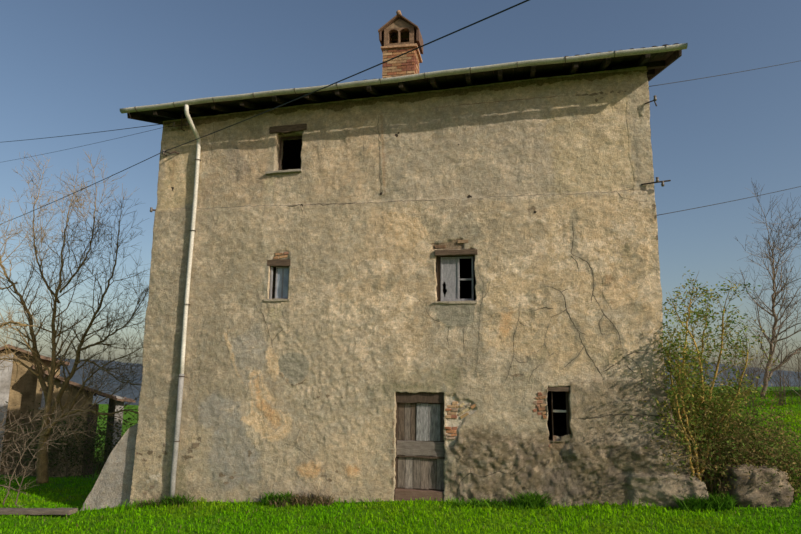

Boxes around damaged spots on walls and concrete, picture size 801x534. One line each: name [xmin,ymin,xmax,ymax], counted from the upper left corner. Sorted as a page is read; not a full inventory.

crack [171,116,441,269]
crack [407,265,489,377]
crack [468,189,649,392]
peeling [222,331,294,457]
spalling [444,393,477,448]
spalling [533,389,548,419]
crack [571,414,671,429]